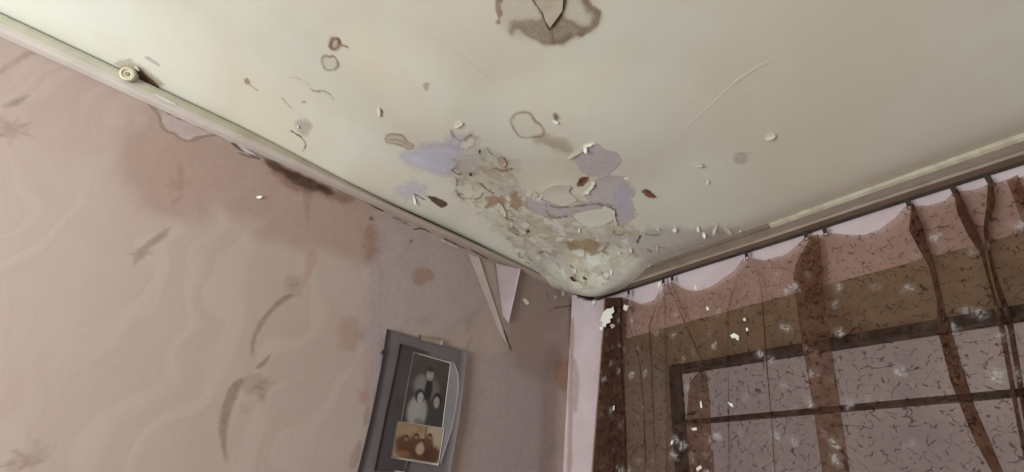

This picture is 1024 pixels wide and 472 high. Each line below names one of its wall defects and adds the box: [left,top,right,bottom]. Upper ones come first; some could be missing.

water stain [511,0,600,44]
water stain [149,105,215,142]
water stain [267,161,331,194]
peeling [450,121,677,299]
peeling [696,222,742,239]